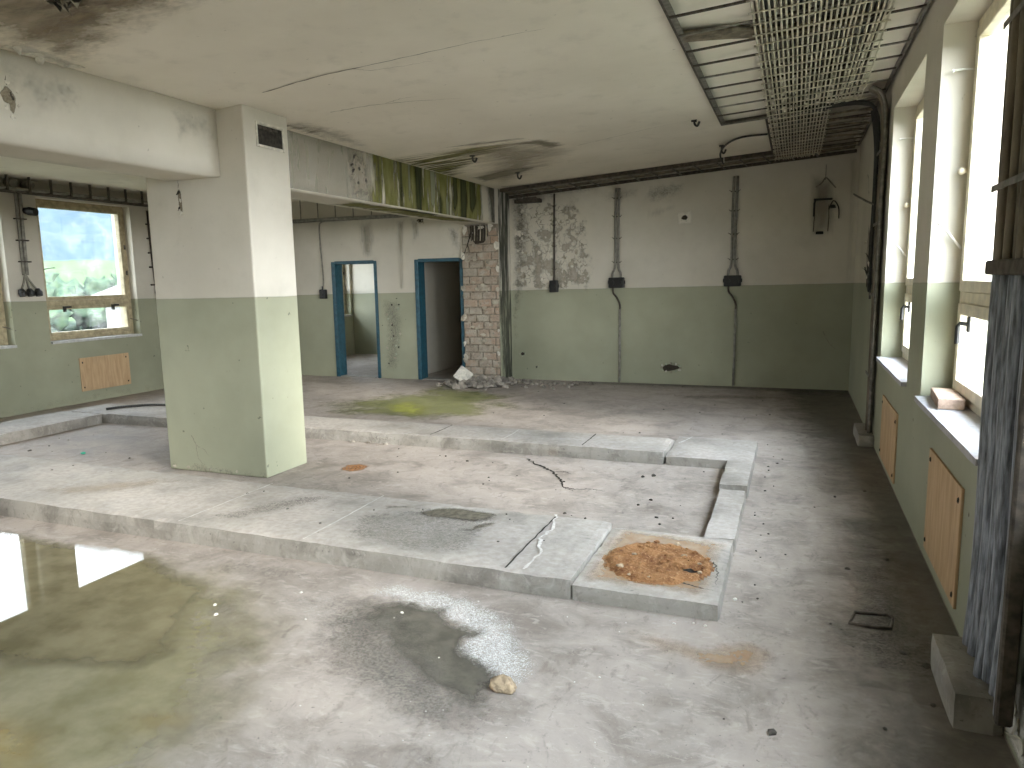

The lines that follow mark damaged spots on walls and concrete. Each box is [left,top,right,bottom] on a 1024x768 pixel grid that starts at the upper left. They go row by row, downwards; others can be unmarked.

damp [0,0,145,43]
crack [262,30,536,93]
flaking render [0,75,21,120]
peeling [513,204,589,288]
flaking render [461,223,501,382]
flaking render [660,362,682,373]
crack [528,459,596,491]
crack [504,514,558,569]
damp [283,584,533,714]